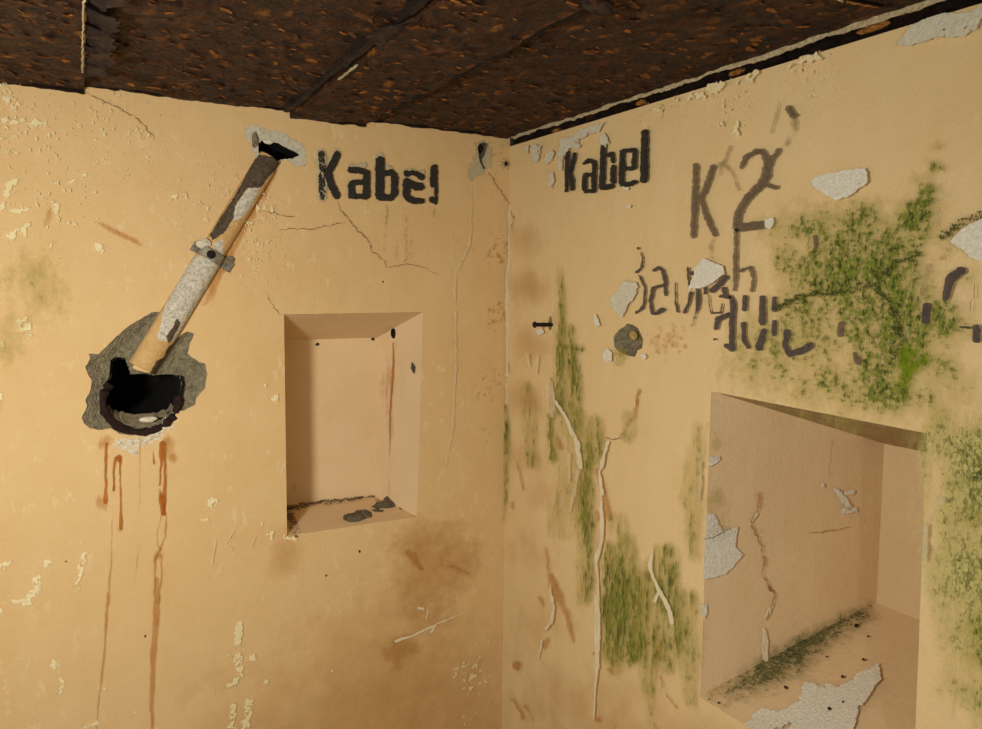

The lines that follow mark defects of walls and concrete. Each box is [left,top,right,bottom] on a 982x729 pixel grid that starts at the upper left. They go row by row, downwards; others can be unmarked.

peeling [898,4,982,46]
peeling [810,168,867,200]
crack [260,201,437,274]
peeling [950,219,982,261]
crack [773,210,982,365]
rust [103,442,123,530]
rust [153,441,173,516]
leakage [546,377,583,512]
leakage [593,441,609,719]
leakage [648,549,674,625]
crack [707,496,776,662]
peeling [744,663,882,729]